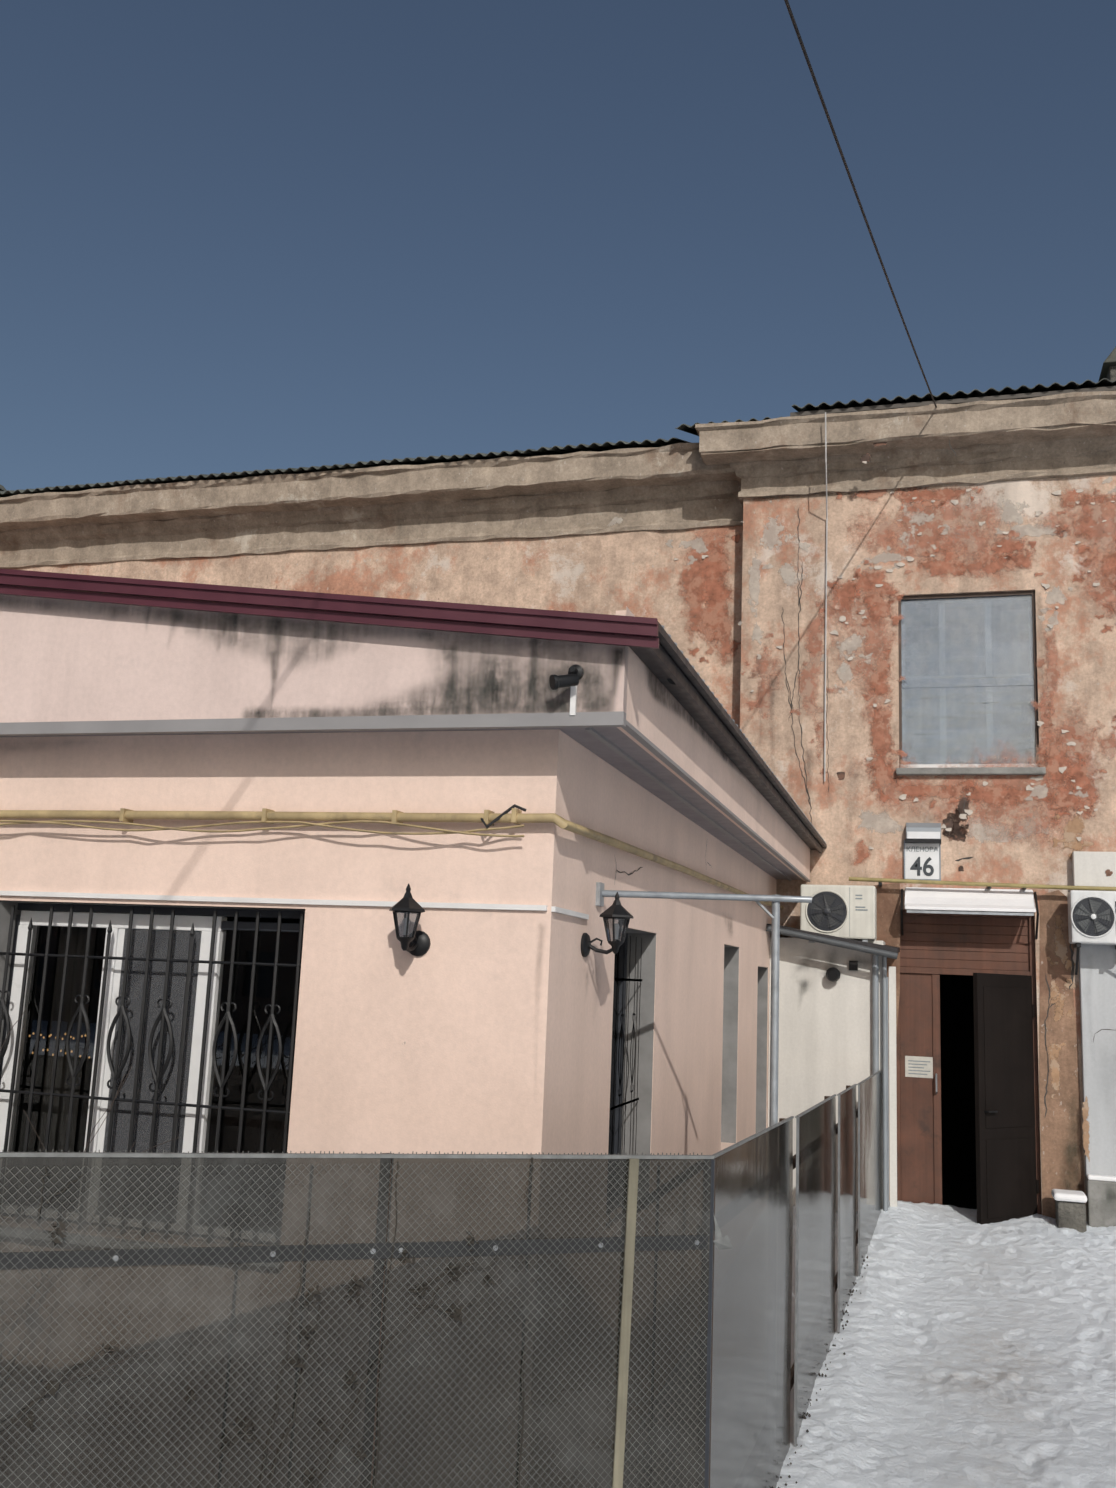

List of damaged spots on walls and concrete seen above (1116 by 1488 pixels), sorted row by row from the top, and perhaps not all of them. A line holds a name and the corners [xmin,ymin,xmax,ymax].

leakage [420,673,598,705]
peeling [666,477,1116,865]